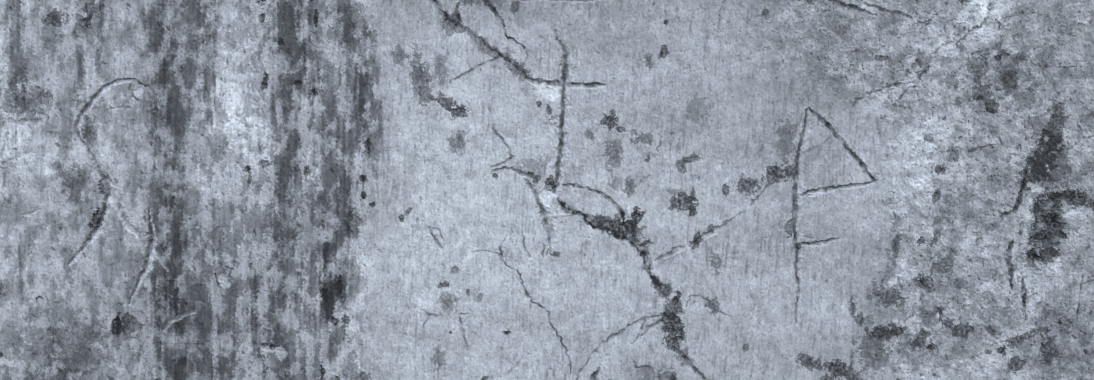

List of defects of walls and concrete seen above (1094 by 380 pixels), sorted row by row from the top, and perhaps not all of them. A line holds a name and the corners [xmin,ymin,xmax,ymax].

damp [0,0,54,121]
damp [46,157,95,207]
damp [41,0,107,145]
damp [136,0,470,380]
crack [426,0,534,84]
crack [492,126,513,157]
crack [849,0,1012,111]
crack [973,93,998,115]
crack [428,226,444,250]
crack [470,172,794,380]
damp [0,303,124,380]
crack [412,306,469,380]